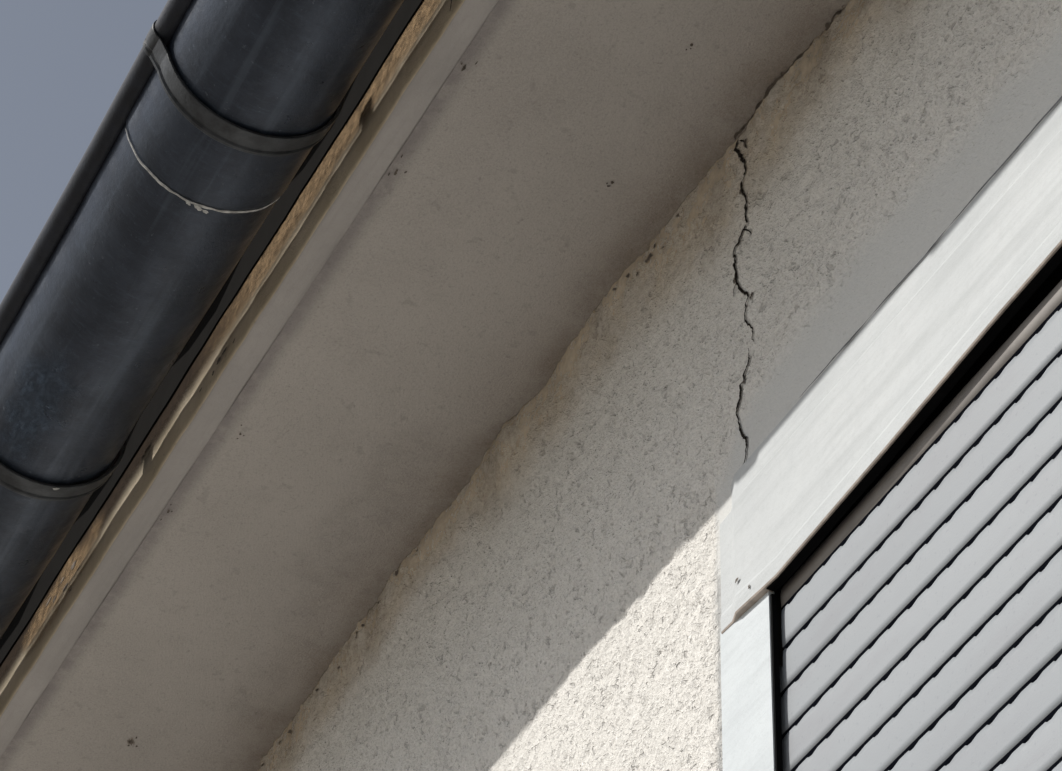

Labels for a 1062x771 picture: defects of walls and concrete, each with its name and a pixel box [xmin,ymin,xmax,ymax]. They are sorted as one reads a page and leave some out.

crack [733,4,848,464]